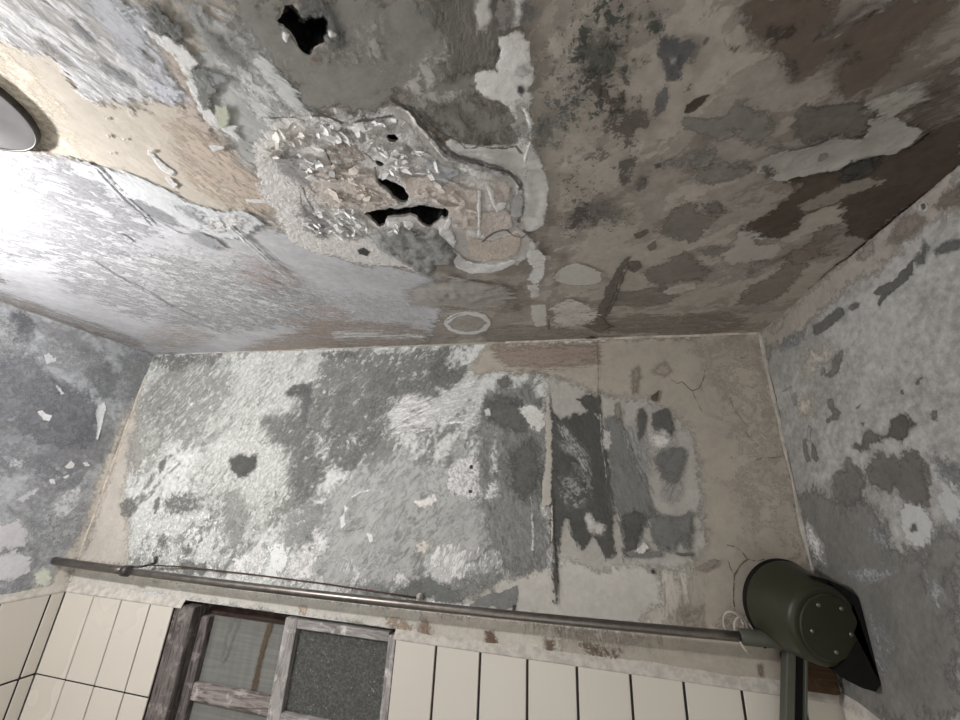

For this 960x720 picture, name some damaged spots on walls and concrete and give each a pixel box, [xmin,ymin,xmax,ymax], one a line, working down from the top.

peeling [0,0,540,374]
damp [162,0,960,342]
peeling [0,518,32,583]
damp [0,566,52,595]
peeling [16,487,39,503]
damp [0,292,467,587]
flaking render [49,171,960,680]
damp [338,376,696,610]
damp [797,449,960,720]